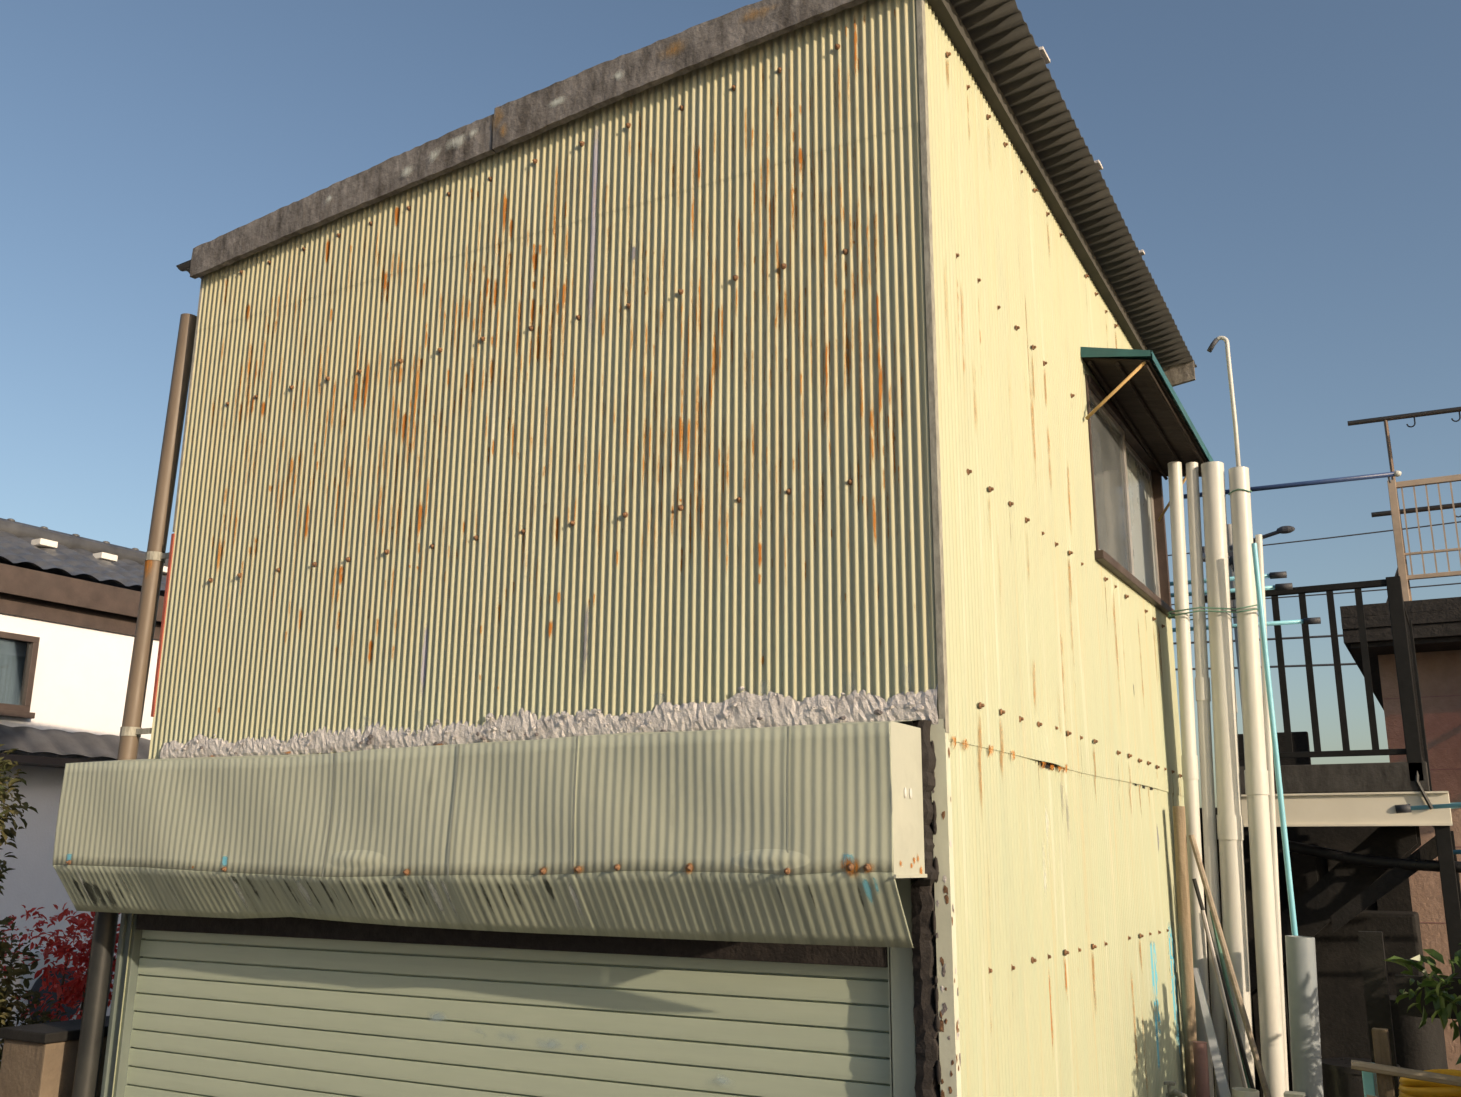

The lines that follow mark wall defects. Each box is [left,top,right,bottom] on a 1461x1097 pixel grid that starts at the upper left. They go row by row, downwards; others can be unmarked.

rust [838,19,865,97]
rust [738,83,913,538]
rust [221,173,573,629]
rust [597,277,742,568]
rust [211,490,258,568]
rust [953,727,1015,794]
rust [842,858,872,875]